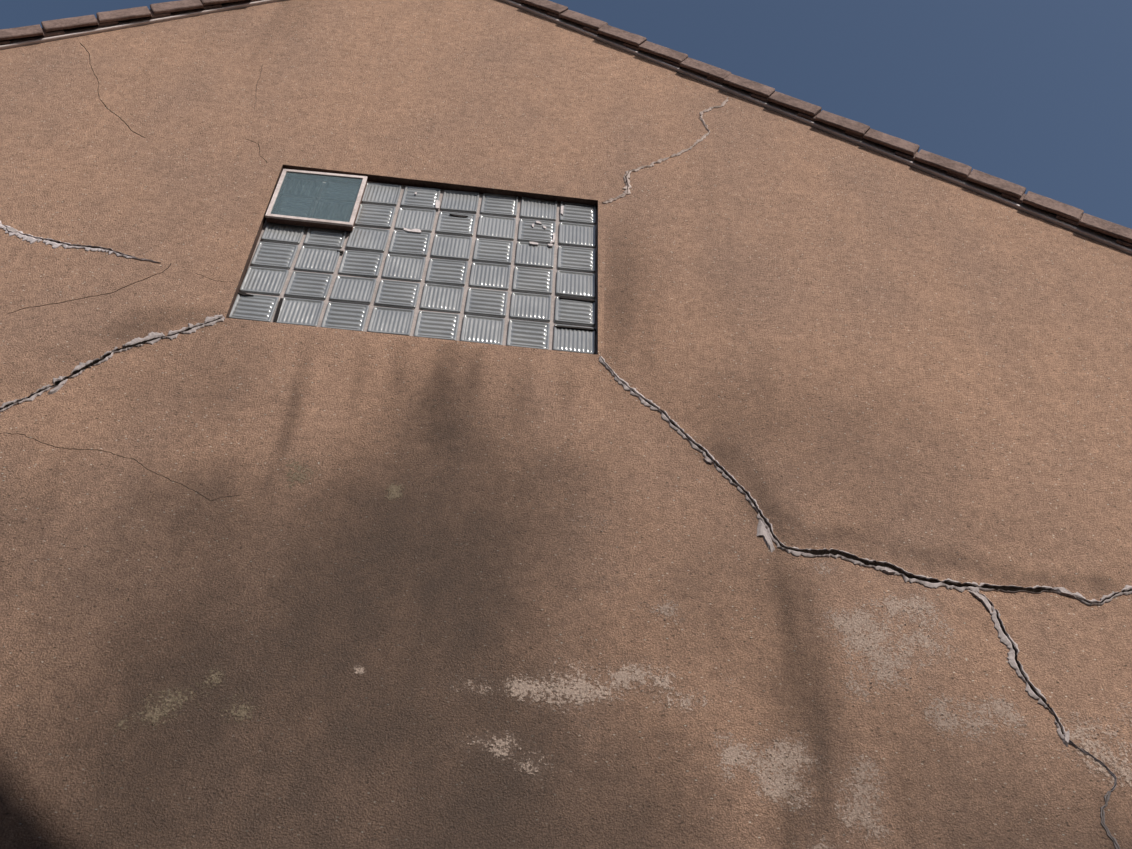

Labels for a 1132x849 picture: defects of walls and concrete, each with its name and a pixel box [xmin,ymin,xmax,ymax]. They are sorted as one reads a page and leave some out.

crack [602,97,729,204]
crack [0,220,171,314]
crack [0,314,240,501]
leakage [152,473,582,849]
crack [599,356,1132,849]